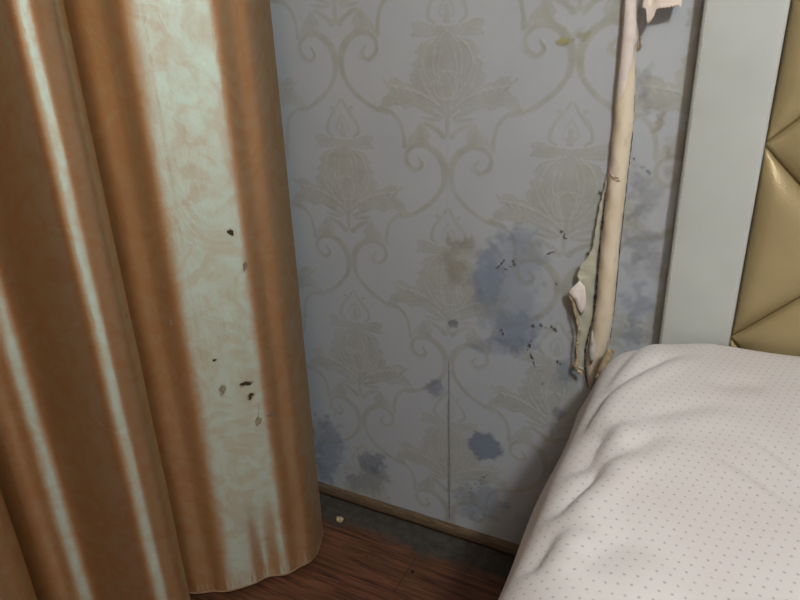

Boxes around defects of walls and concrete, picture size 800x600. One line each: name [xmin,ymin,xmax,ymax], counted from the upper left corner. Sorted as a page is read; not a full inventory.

peeling [568,281,586,314]
damp [470,433,502,460]